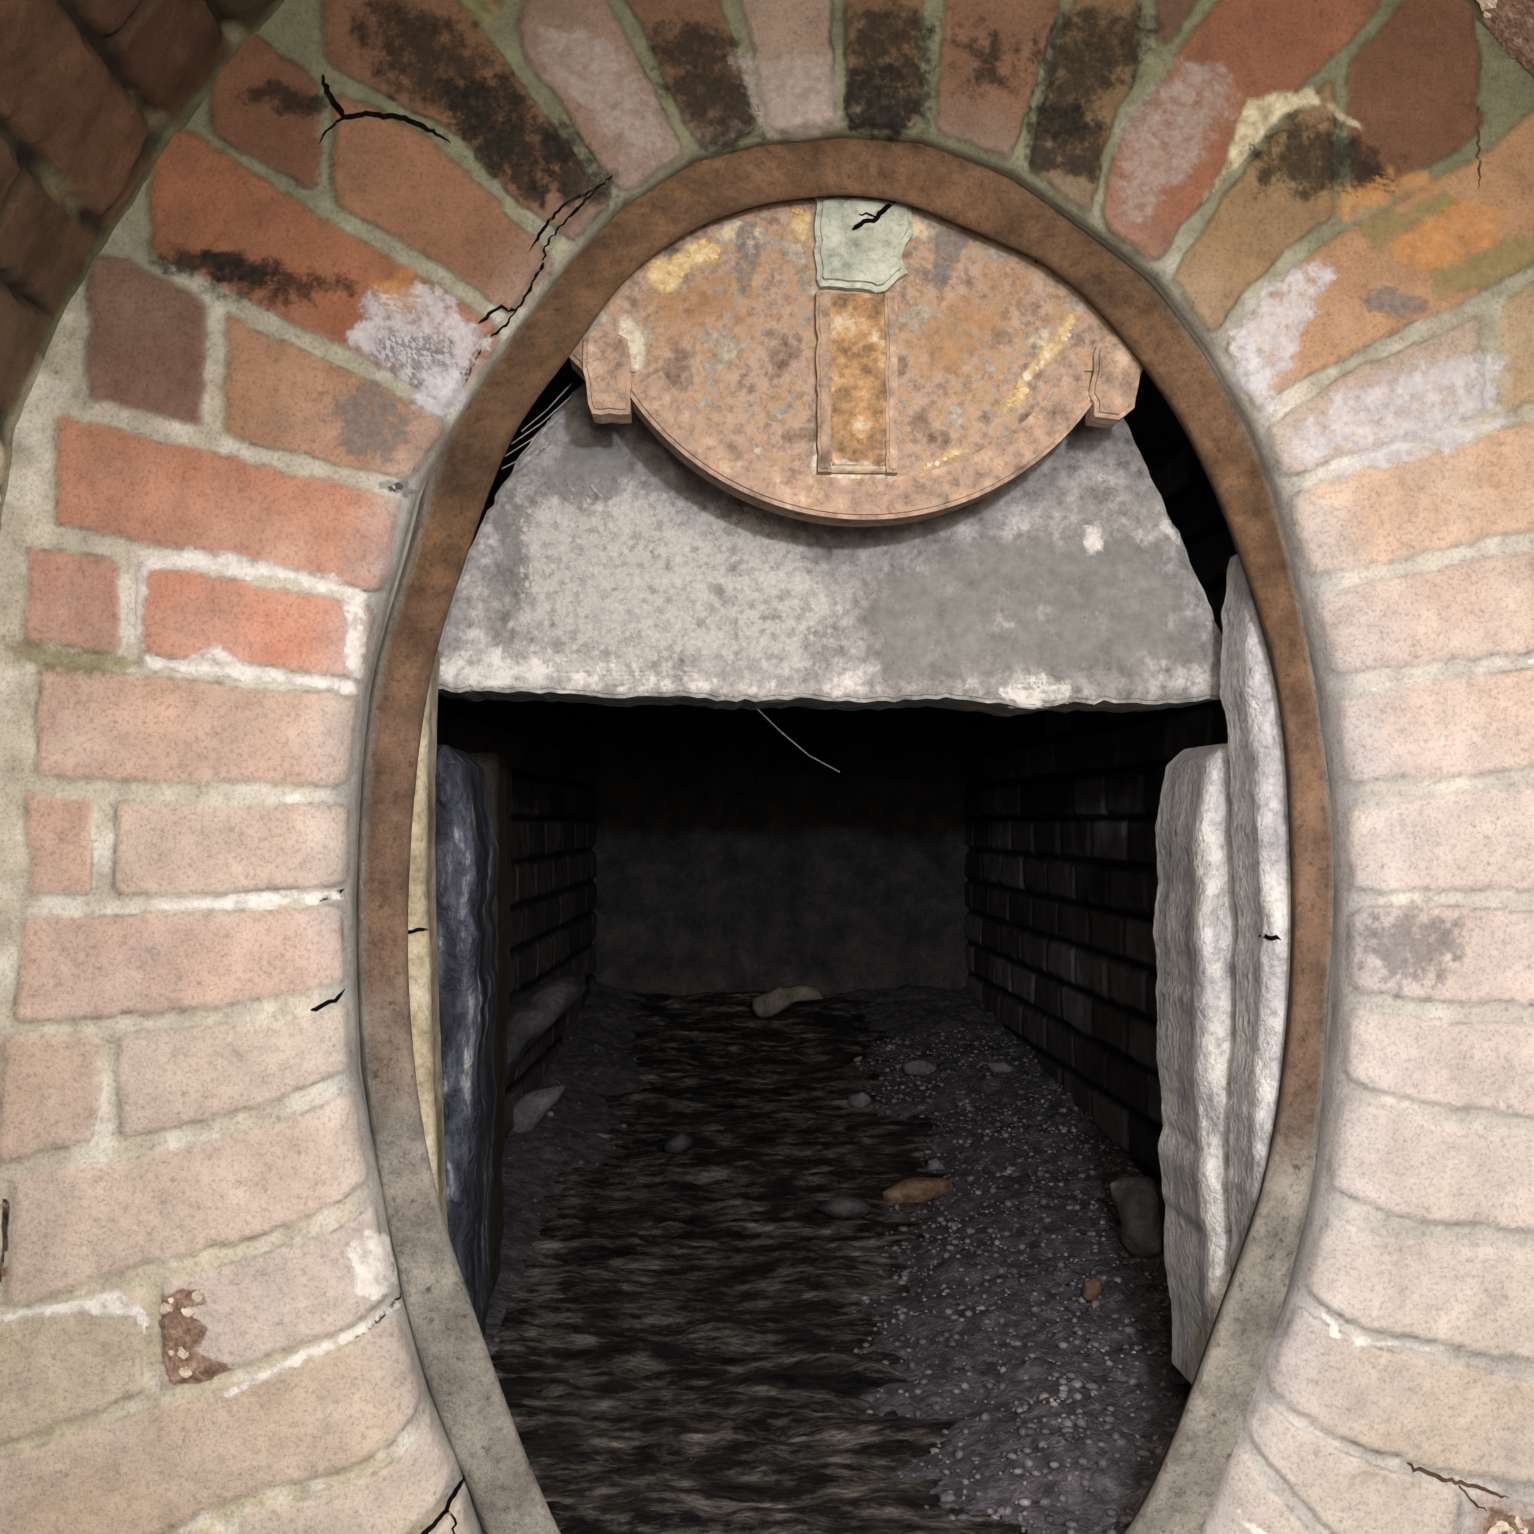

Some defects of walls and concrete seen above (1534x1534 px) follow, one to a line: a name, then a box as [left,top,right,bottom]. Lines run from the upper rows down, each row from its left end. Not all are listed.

spalling [1476,0,1534,70]
crack [319,74,451,143]
damp [445,74,571,208]
damp [843,64,921,141]
damp [1027,103,1102,181]
damp [1213,88,1361,191]
crack [446,174,613,415]
damp [347,282,491,416]
spalling [159,1288,231,1384]
crack [421,1475,465,1534]
crack [1407,1462,1509,1511]
spalling [1481,1507,1534,1534]